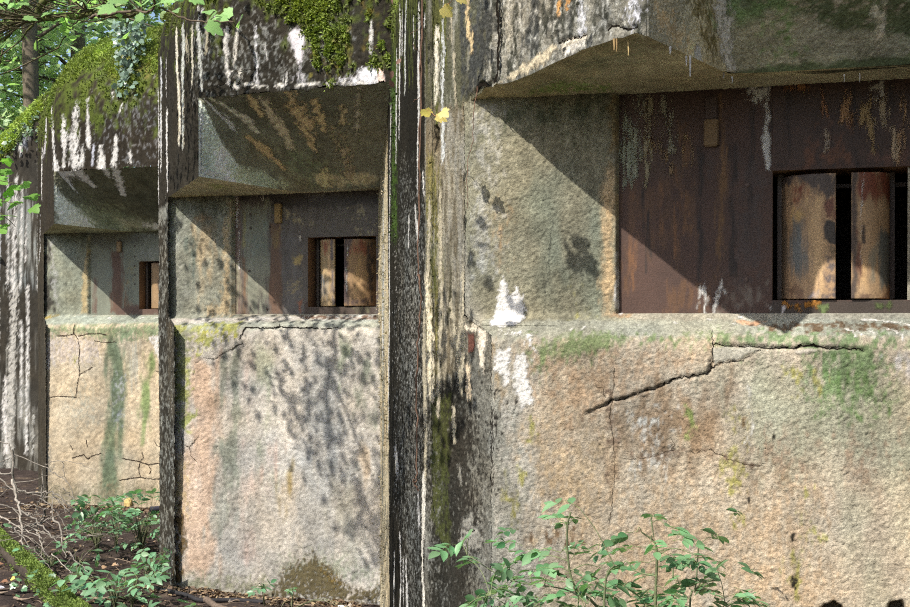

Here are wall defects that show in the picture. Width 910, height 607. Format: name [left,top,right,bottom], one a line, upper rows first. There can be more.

leakage [41,98,126,196]
leakage [158,7,363,202]
corrosion [619,93,676,188]
corrosion [841,96,906,165]
leakage [0,177,38,468]
crack [50,325,115,398]
crack [195,324,338,363]
leakage [382,191,390,411]
leakage [389,0,534,607]
corrosion [781,300,829,313]
crack [119,443,160,481]
crack [586,330,863,524]